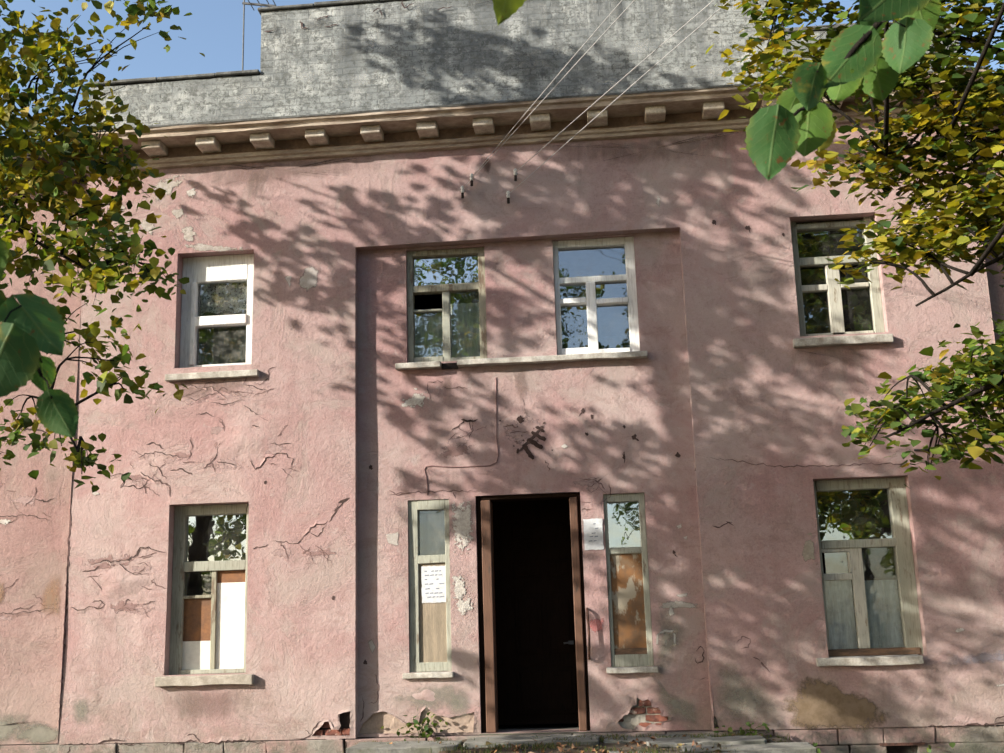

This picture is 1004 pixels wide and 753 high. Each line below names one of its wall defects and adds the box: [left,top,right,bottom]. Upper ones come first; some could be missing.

crack [104,367,296,496]
crack [442,419,486,458]
peeling [499,412,568,460]
crack [253,498,349,564]
peeling [450,501,475,554]
crack [0,481,265,753]
peeling [452,575,473,615]
flaking render [310,705,477,740]
flaking render [615,693,674,732]